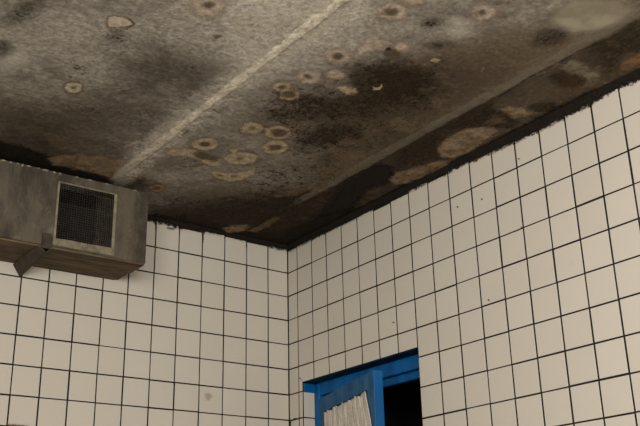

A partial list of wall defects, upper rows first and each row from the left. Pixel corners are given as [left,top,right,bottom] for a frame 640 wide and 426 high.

peeling [107,16,135,28]
leakage [241,35,443,154]
leakage [0,141,118,185]
leakage [125,68,640,252]
peeling [389,127,498,184]